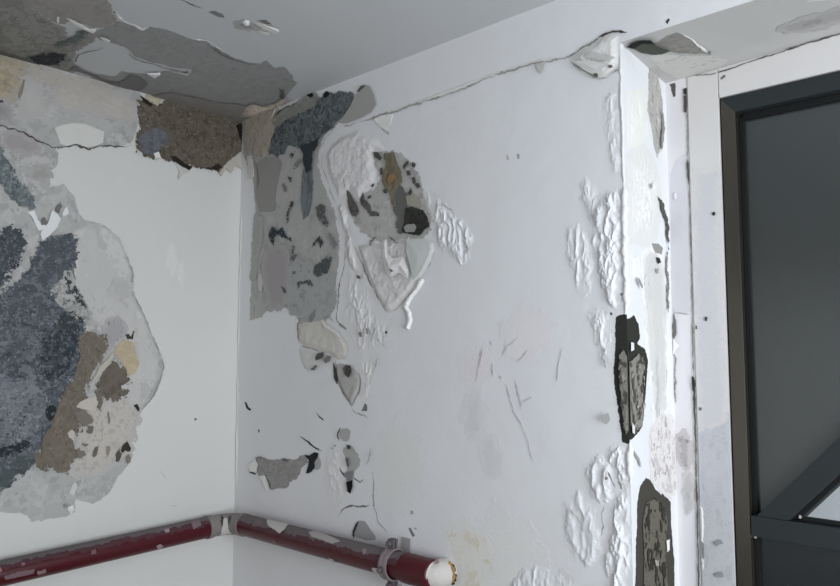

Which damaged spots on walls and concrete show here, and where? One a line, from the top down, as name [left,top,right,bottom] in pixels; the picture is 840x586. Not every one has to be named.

spalling [655,32,711,55]
crack [0,125,131,150]
spalling [0,0,364,320]
crack [316,30,627,203]
spalling [0,267,139,522]
spalling [125,253,165,412]
peeling [296,315,367,411]
spalling [602,312,648,444]
spalling [248,455,308,490]
spalling [337,428,361,494]
spalling [352,521,376,540]
spalling [635,478,675,586]